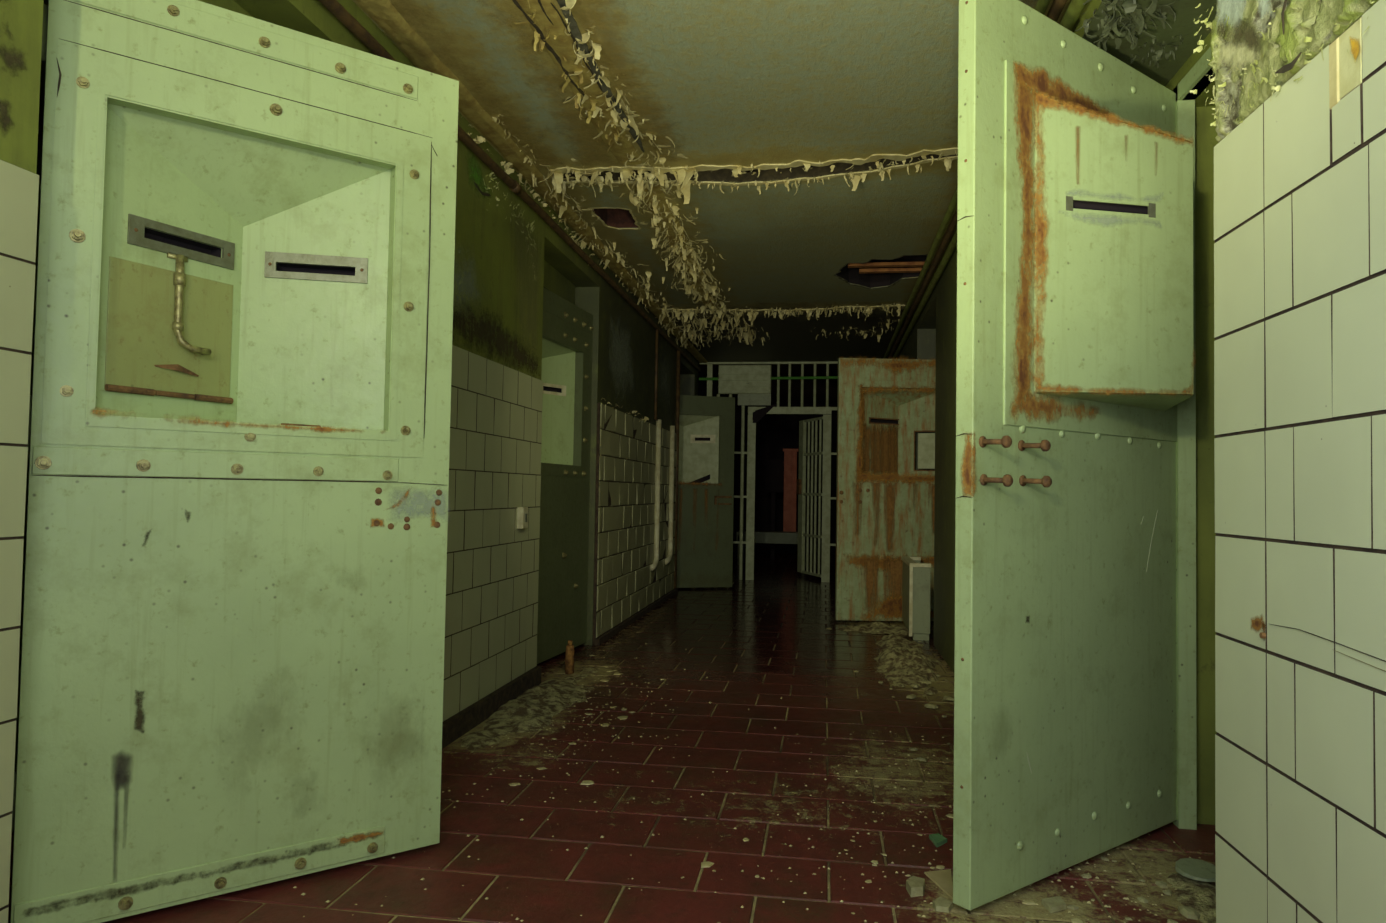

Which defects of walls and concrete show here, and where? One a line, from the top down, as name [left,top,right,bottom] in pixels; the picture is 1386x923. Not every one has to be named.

damp [1217,22,1259,50]
peeling [468,0,957,349]
rust [1012,64,1193,421]
rust [841,358,936,620]
rust [962,433,976,495]